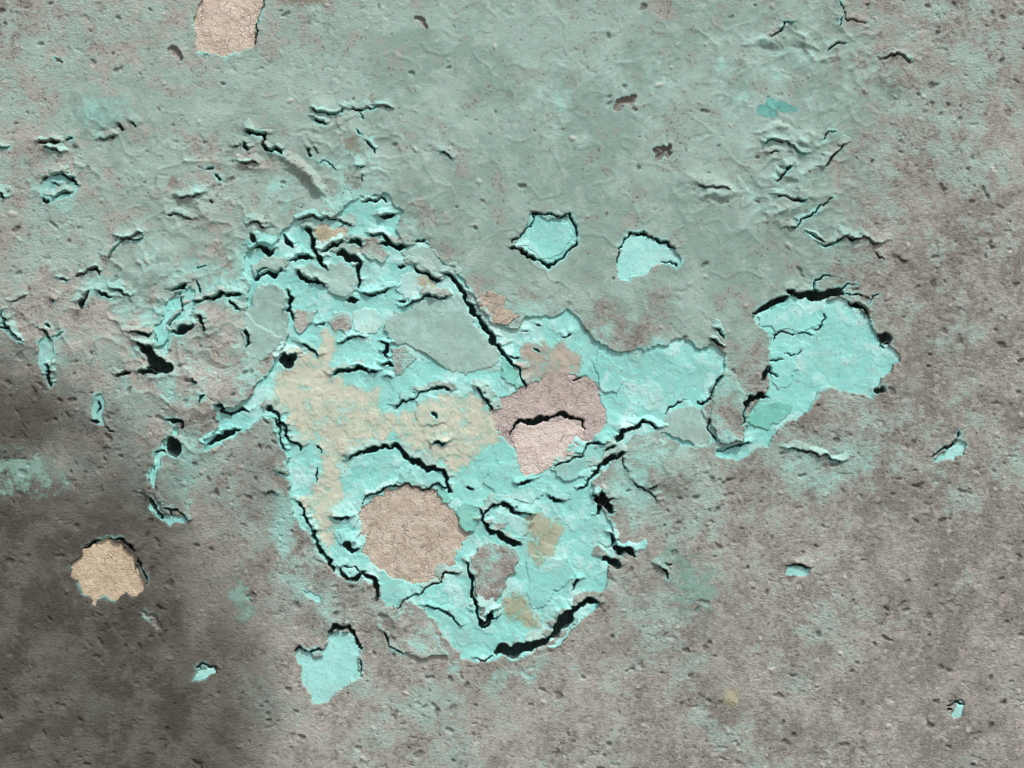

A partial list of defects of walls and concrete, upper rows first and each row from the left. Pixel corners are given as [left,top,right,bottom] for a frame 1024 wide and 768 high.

flaking render [193,0,265,57]
peeling [111,193,900,663]
peeling [933,431,966,462]
flaking render [71,536,148,606]
peeling [294,623,363,704]